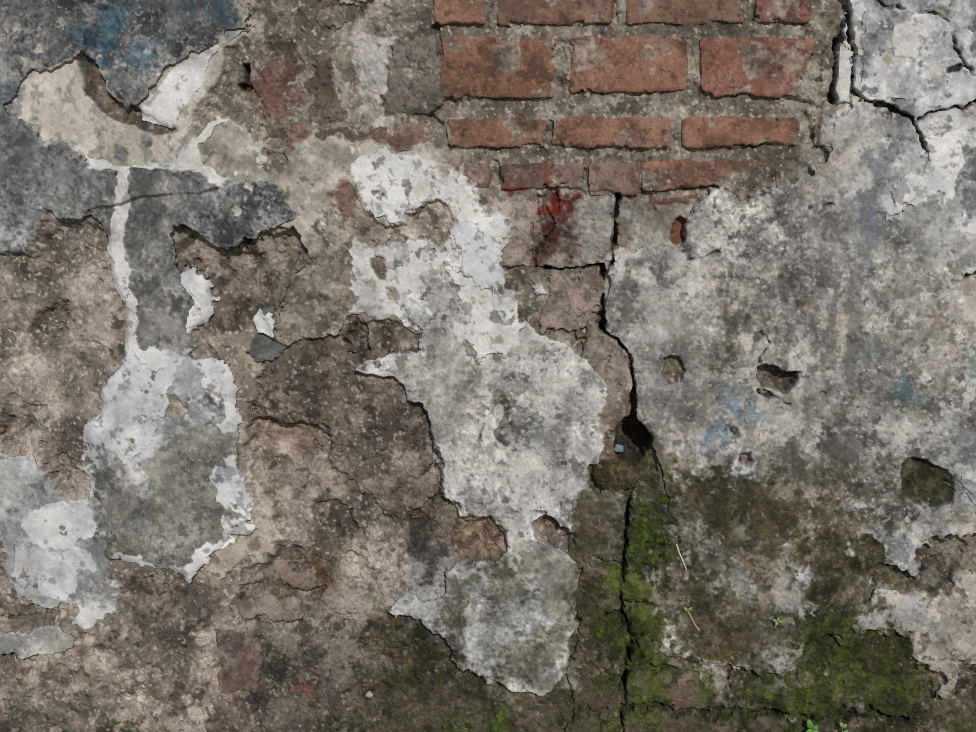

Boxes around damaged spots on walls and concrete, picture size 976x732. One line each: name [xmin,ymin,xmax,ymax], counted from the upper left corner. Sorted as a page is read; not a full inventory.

crack [827,0,976,150]
crack [84,187,224,215]
flaking render [0,0,853,502]
crack [535,193,637,417]
crack [688,249,723,262]
crack [809,203,839,214]
flaking render [0,148,625,732]
flaking render [619,633,748,694]
flaking render [785,533,976,732]